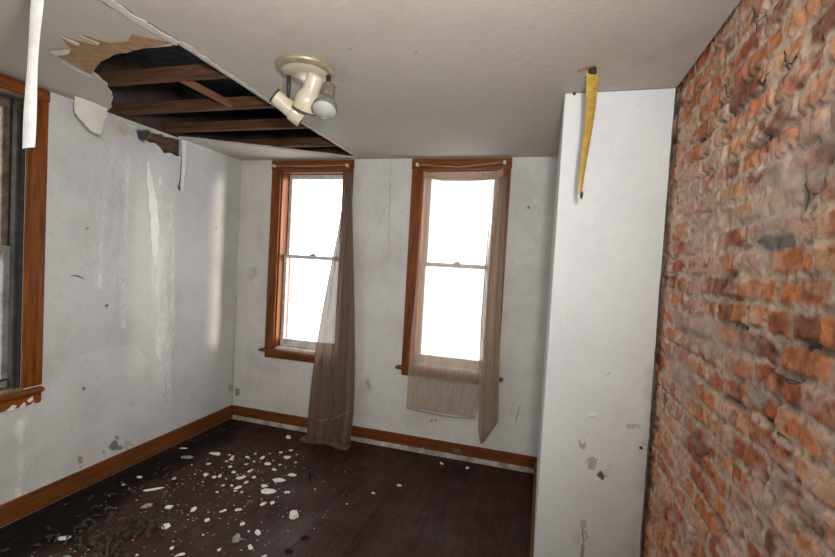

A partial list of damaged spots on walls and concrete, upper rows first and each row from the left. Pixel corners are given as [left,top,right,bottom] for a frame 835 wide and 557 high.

peeling [50,35,100,78]
spalling [179,42,273,105]
peeling [70,96,107,137]
spalling [301,121,358,157]